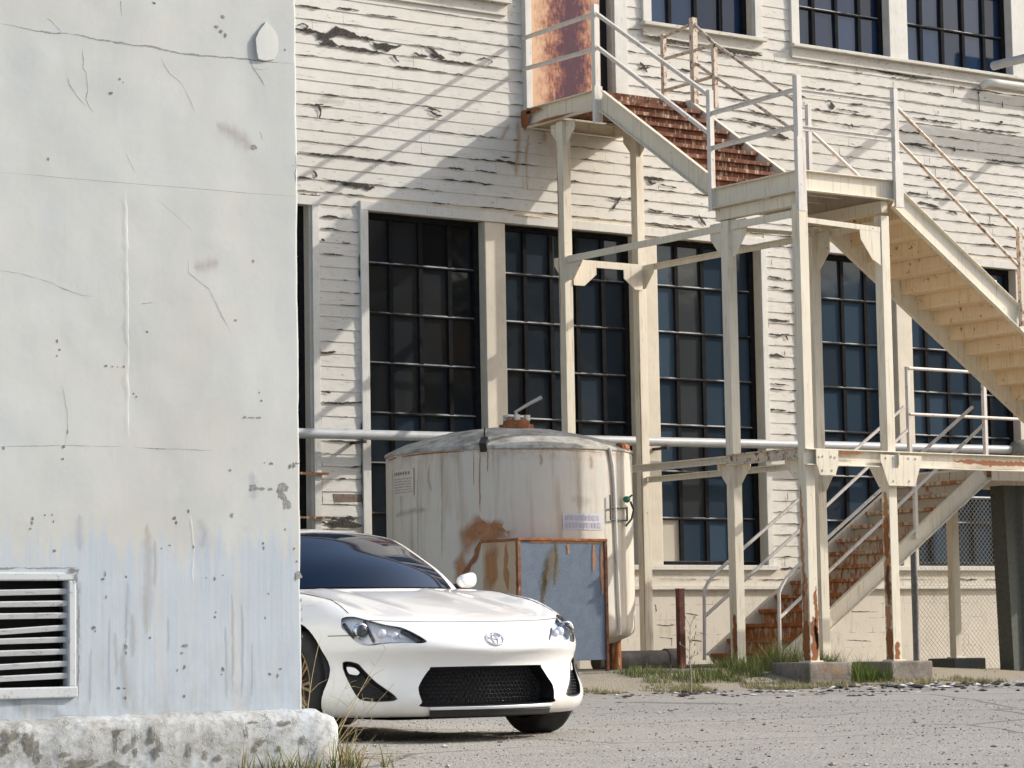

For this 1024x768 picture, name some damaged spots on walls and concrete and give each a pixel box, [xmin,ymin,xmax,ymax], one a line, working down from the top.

crack [6,20,279,109]
peeling [295,5,522,83]
spalling [297,85,499,164]
spalling [628,18,1024,259]
peeling [297,139,533,256]
spalling [750,223,796,435]
corrosion [953,459,1024,467]
corrosion [456,518,508,589]
corrosion [800,489,819,661]
corrosion [883,492,900,660]